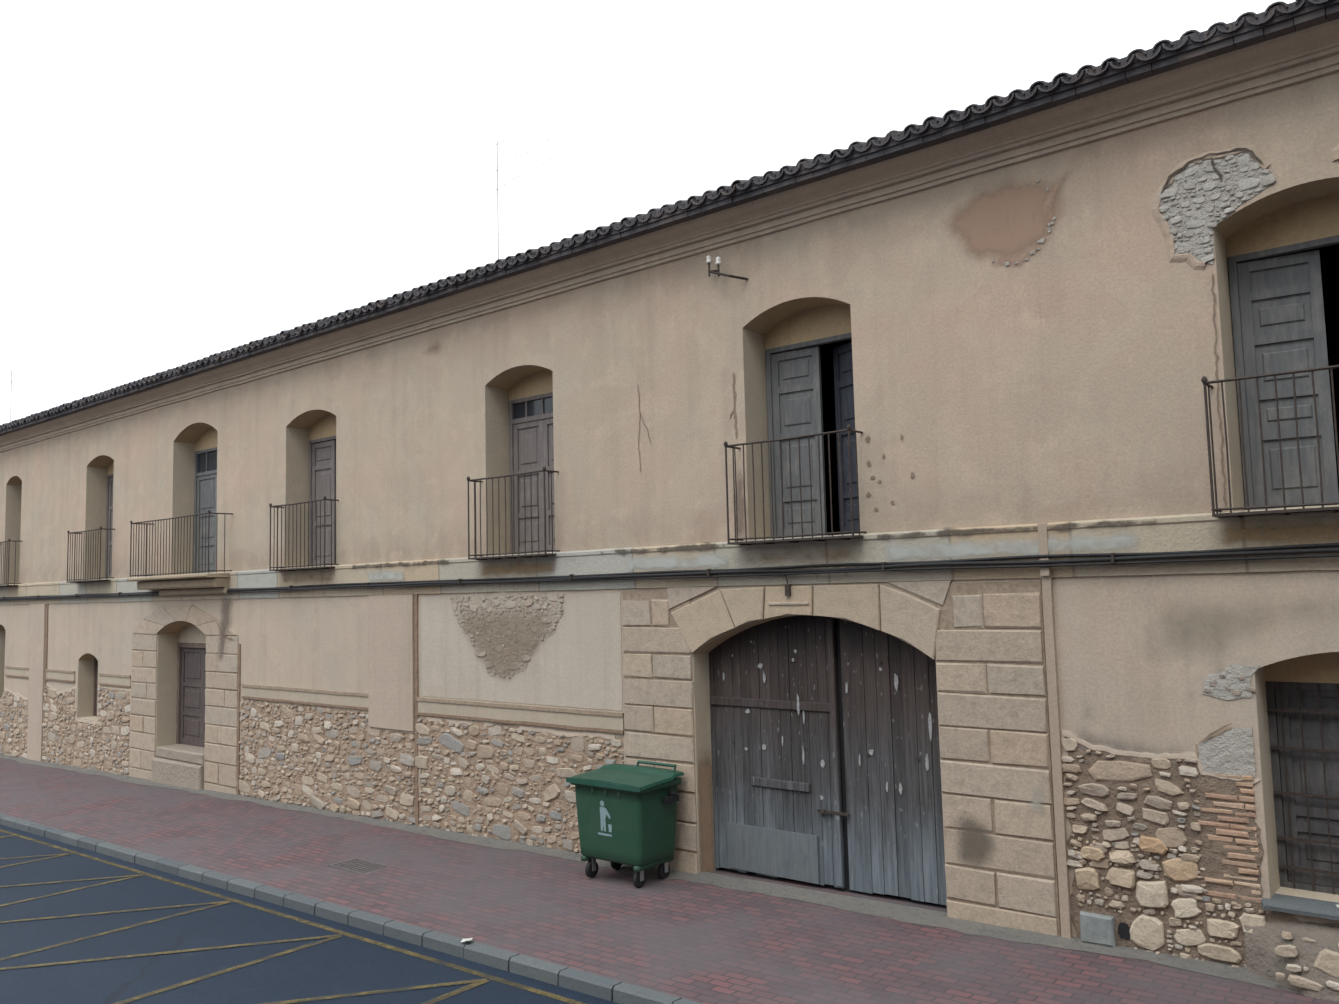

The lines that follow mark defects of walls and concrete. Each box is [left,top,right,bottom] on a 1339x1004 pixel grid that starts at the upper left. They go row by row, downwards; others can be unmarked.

flaking render [1151,145,1277,270]
crack [637,383,651,472]
flaking render [449,592,564,678]
flaking render [1202,664,1260,700]
leakage [962,821,990,861]